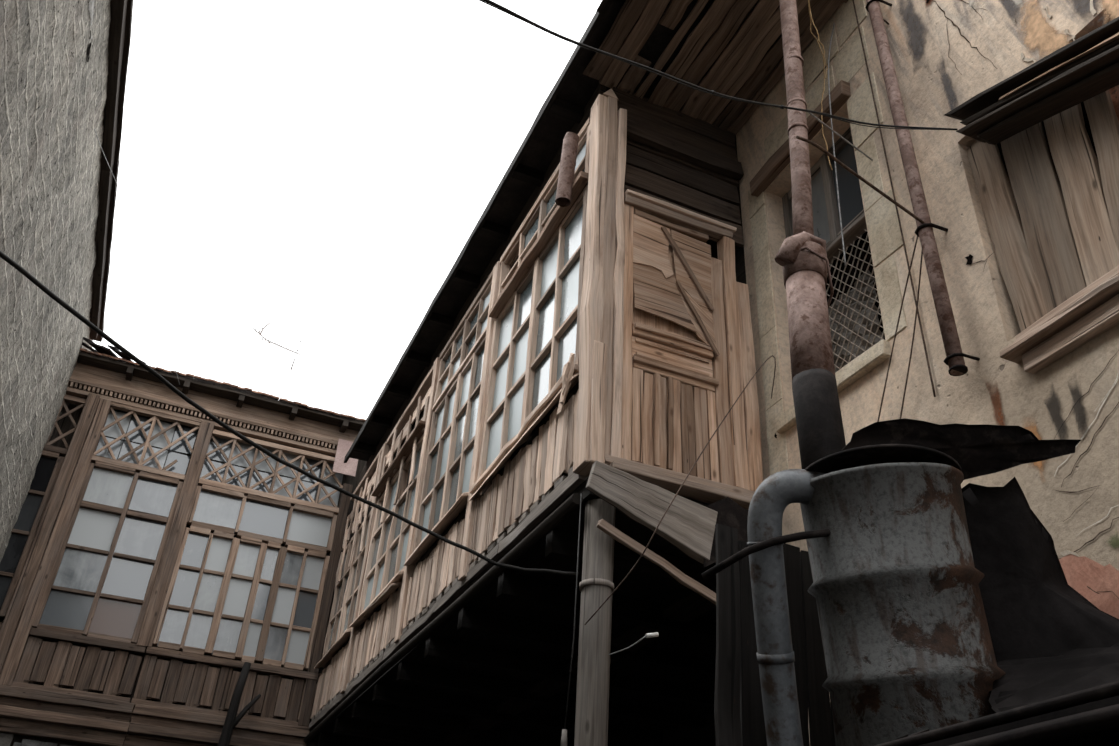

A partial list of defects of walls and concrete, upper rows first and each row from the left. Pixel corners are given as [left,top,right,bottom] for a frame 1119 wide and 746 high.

crack [932,0,997,75]
rust [988,386,1004,425]
crack [1054,350,1119,439]
crack [1055,402,1119,522]
crack [1059,517,1119,559]
peeling [1059,550,1119,619]